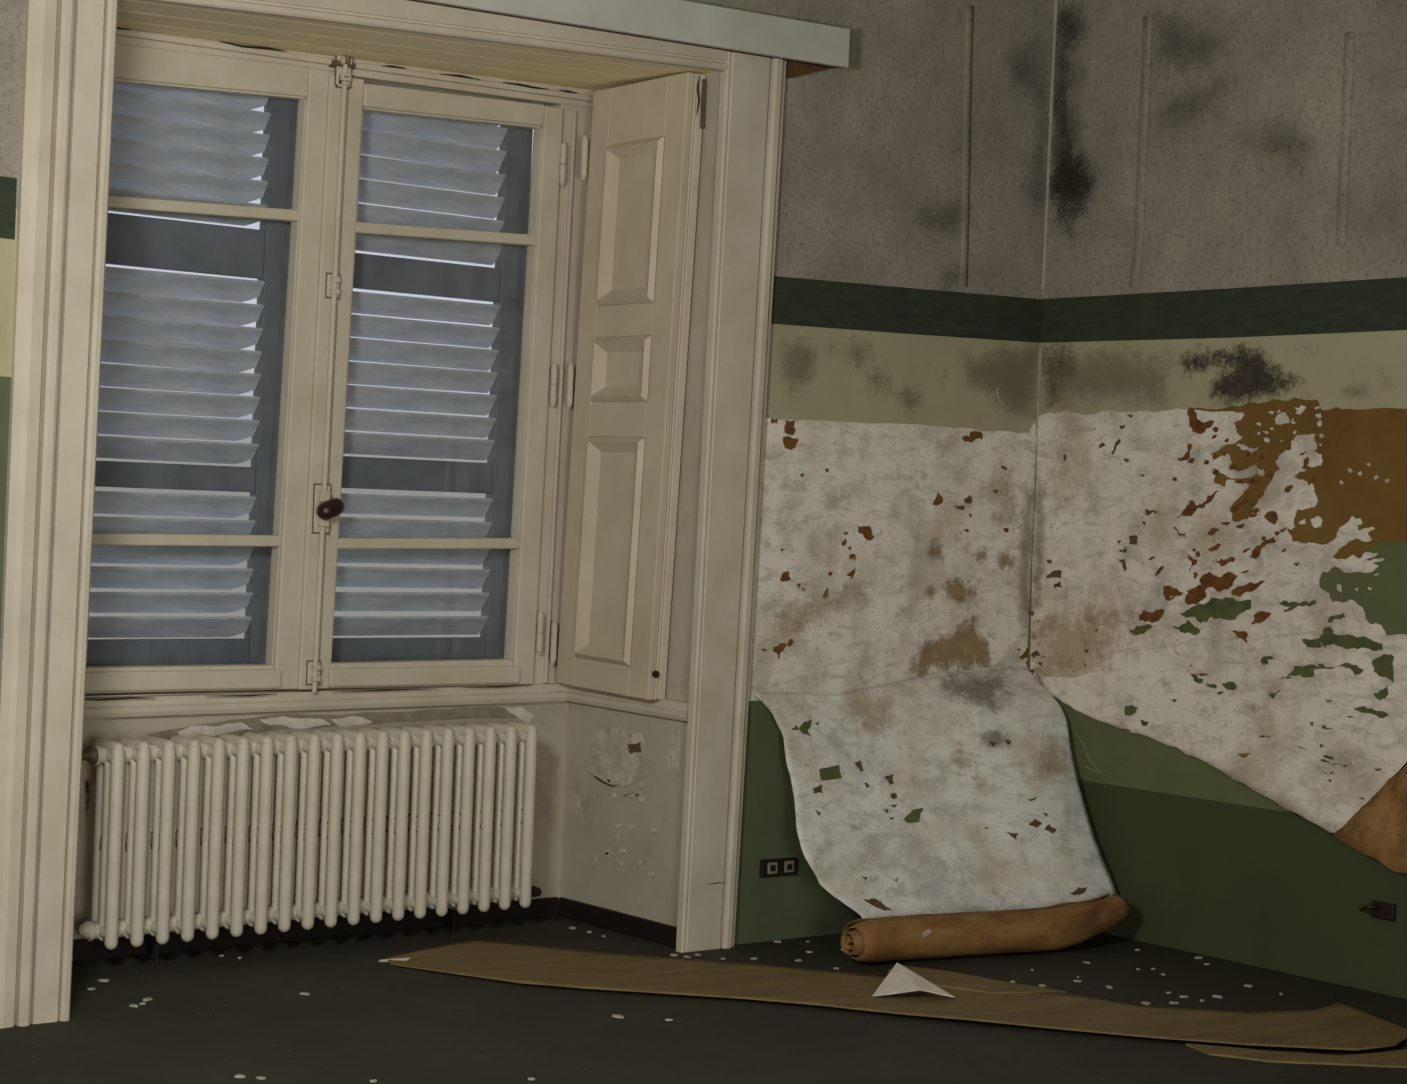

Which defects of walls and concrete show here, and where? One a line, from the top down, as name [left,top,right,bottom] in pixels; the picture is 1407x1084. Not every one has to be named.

leakage [1053,11,1088,204]
leakage [1183,344,1295,403]
peeling [749,405,1394,718]
peeling [792,719,820,736]
peeling [1124,705,1148,733]
peeling [1295,722,1347,782]
peeling [813,760,923,823]
peeling [1006,797,1057,840]